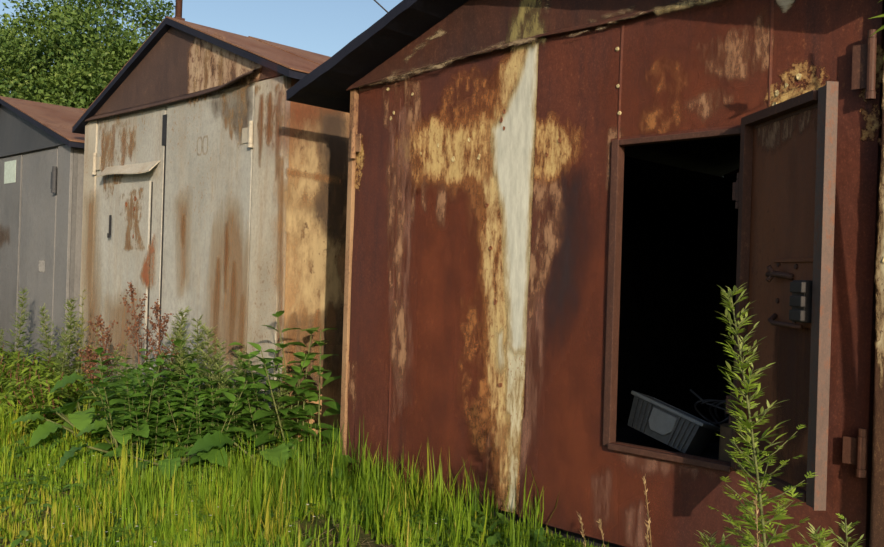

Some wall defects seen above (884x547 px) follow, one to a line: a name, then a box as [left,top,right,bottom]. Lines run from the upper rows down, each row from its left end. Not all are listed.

rust [124,188,155,287]
rust [209,210,248,363]
damp [315,113,349,244]
rust [417,68,500,160]
rust [409,142,518,513]
peeling [372,38,580,514]
rust [520,130,563,477]
rust [641,61,732,134]
rust [707,16,774,80]
peeling [764,60,829,107]
peeling [858,42,884,387]
rust [744,327,811,490]